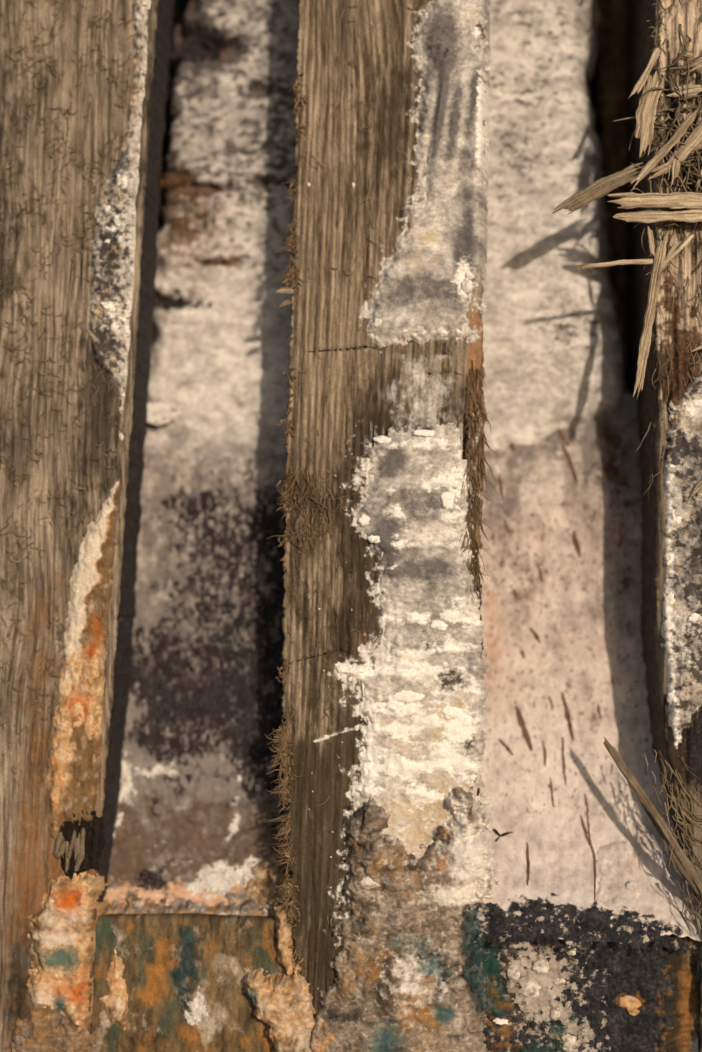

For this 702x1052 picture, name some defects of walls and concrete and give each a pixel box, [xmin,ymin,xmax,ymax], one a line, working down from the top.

corrosion [44,479,120,840]
leakage [113,469,288,842]
corrosion [26,871,112,1032]
peeling [100,949,129,1031]